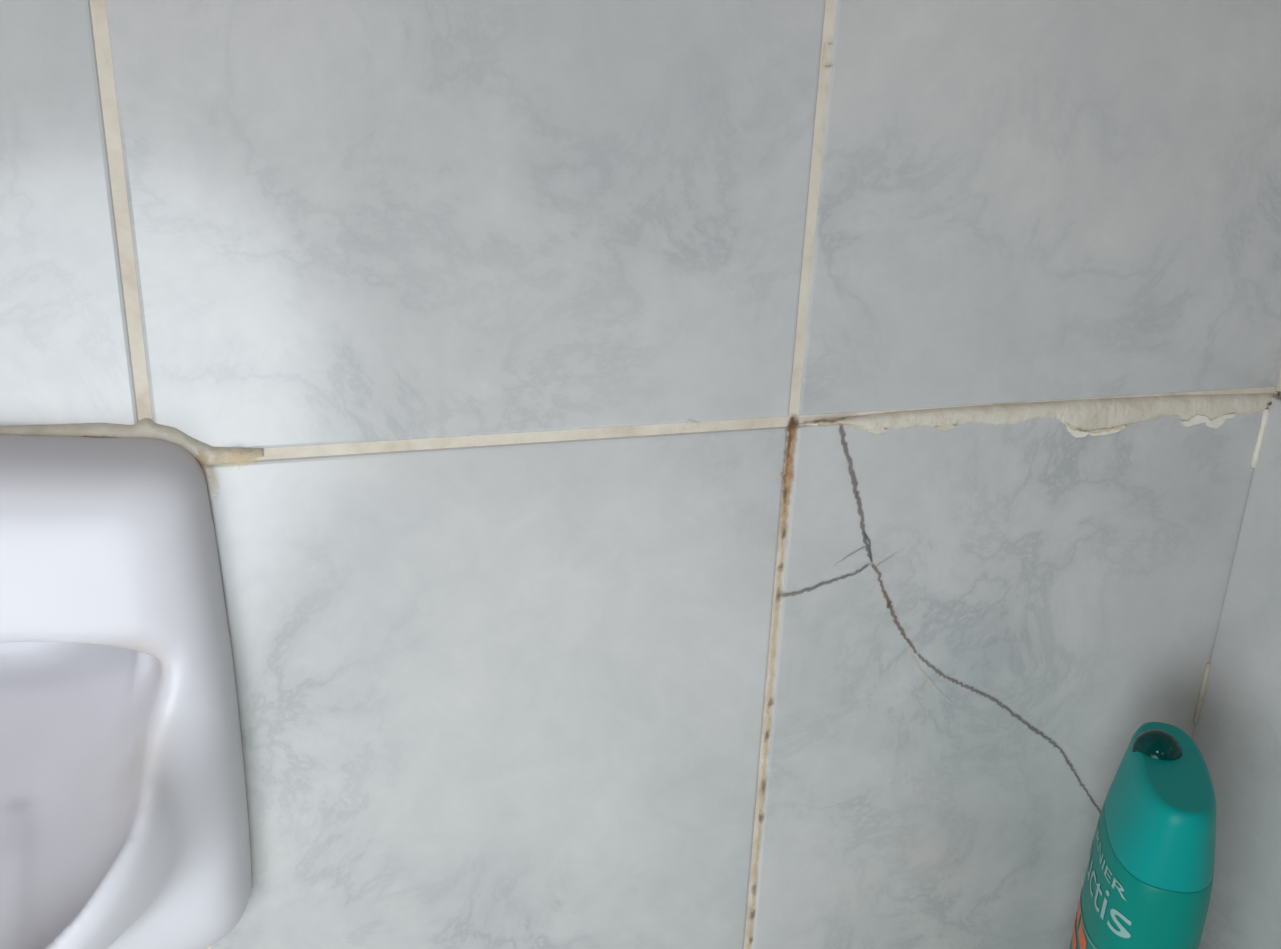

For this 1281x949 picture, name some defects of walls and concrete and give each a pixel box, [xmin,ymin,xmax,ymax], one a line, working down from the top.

corrosion [782,418,796,536]
peeling [1066,424,1127,438]
peeling [1181,413,1235,428]
crack [780,424,1101,814]